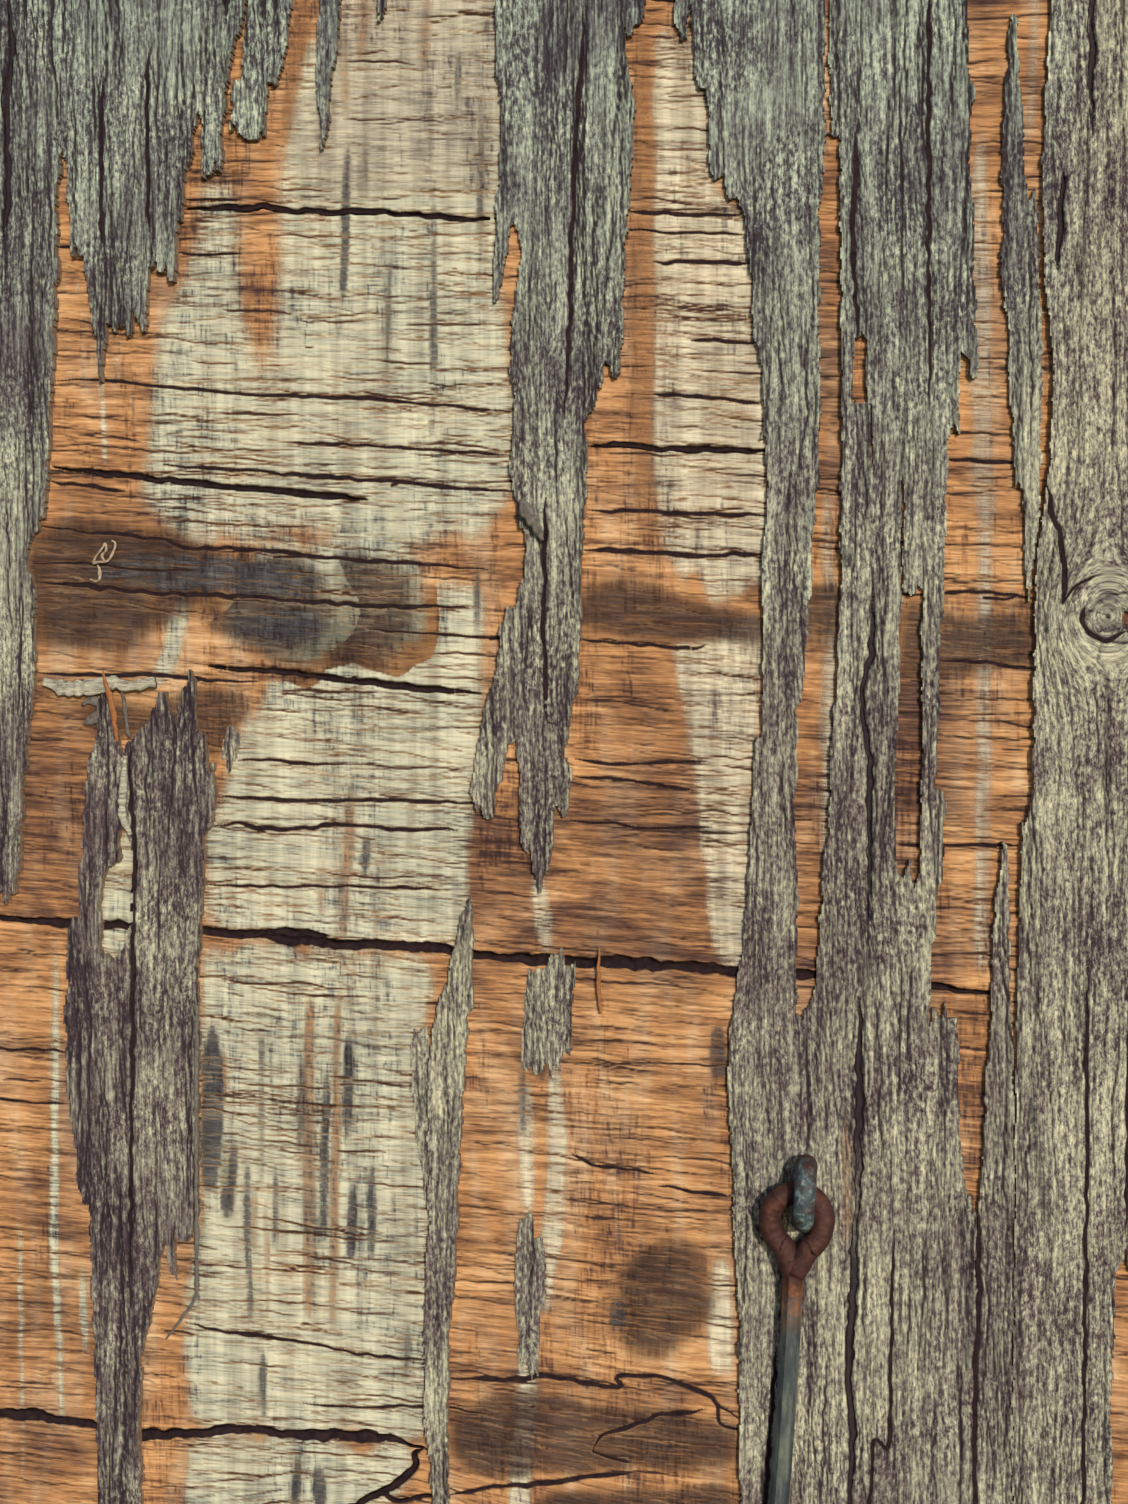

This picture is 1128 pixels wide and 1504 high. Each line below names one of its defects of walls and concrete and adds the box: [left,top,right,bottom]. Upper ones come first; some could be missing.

peeling [0,88,187,904]
damp [31,522,337,683]
crack [35,442,552,725]
damp [329,555,412,666]
peeling [470,335,591,893]
peeling [175,669,217,773]
damp [171,690,247,744]
crack [221,758,474,832]
crack [202,927,739,975]
peeling [1010,632,1128,1504]
damp [609,1241,734,1374]
crack [142,1323,777,1504]